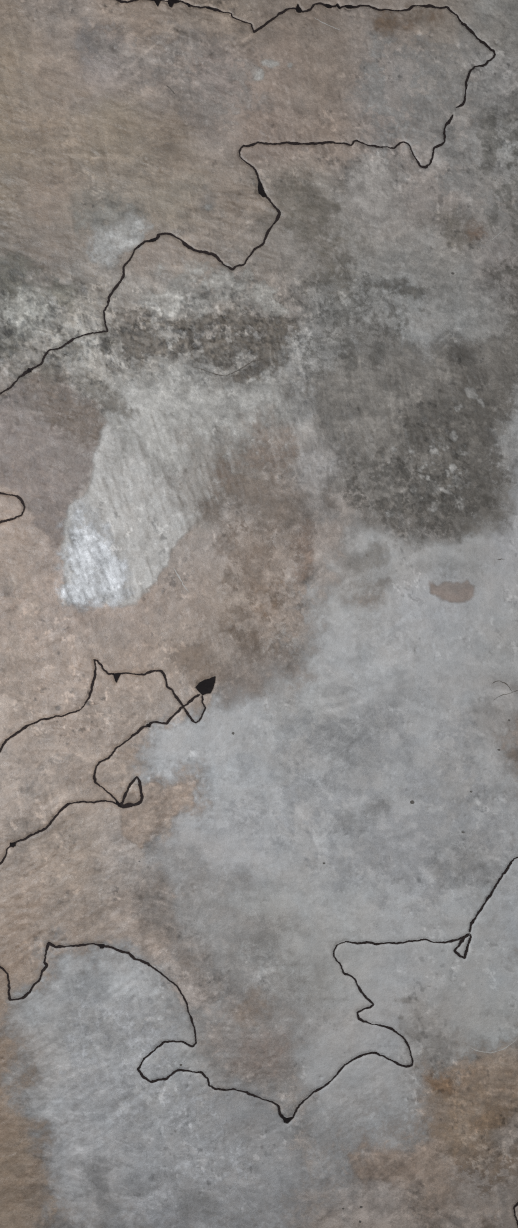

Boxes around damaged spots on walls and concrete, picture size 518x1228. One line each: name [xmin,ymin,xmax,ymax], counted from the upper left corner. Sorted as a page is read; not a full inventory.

crack [0,0,496,394]
water stain [101,154,397,383]
crack [0,492,25,523]
water stain [202,425,307,531]
water stain [287,266,518,543]
crack [0,659,215,864]
crack [0,857,518,1123]